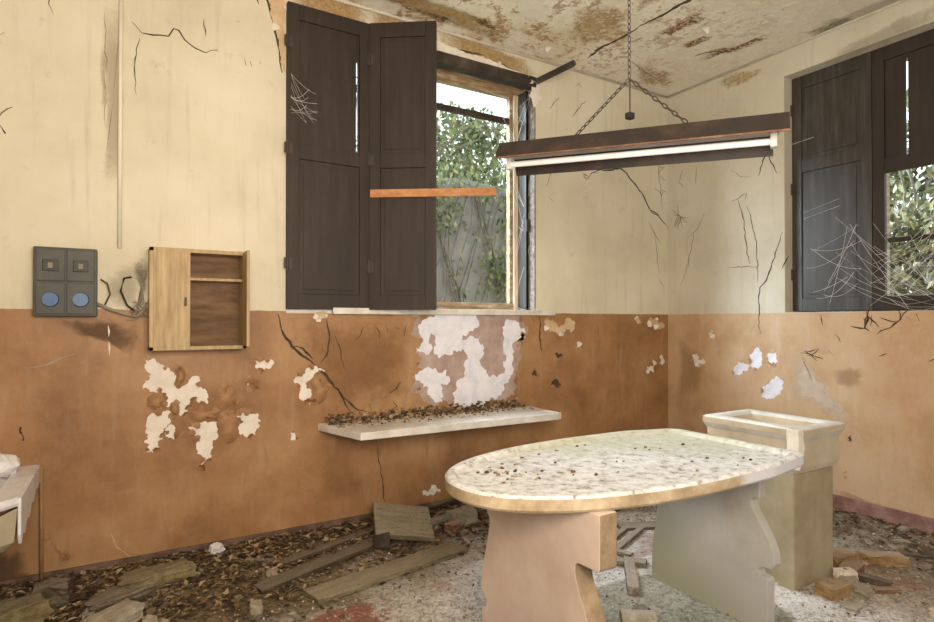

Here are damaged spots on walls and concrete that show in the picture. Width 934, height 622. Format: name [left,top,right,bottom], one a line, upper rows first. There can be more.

crack [132,20,213,92]
peeling [437,41,542,108]
crack [582,165,705,288]
crack [731,156,789,330]
peeling [143,358,218,472]
peeling [235,407,261,439]
peeling [242,354,274,393]
peeling [294,364,325,405]
crack [278,314,406,412]
peeling [411,308,528,407]
peeling [544,317,575,336]
peeling [731,347,783,399]